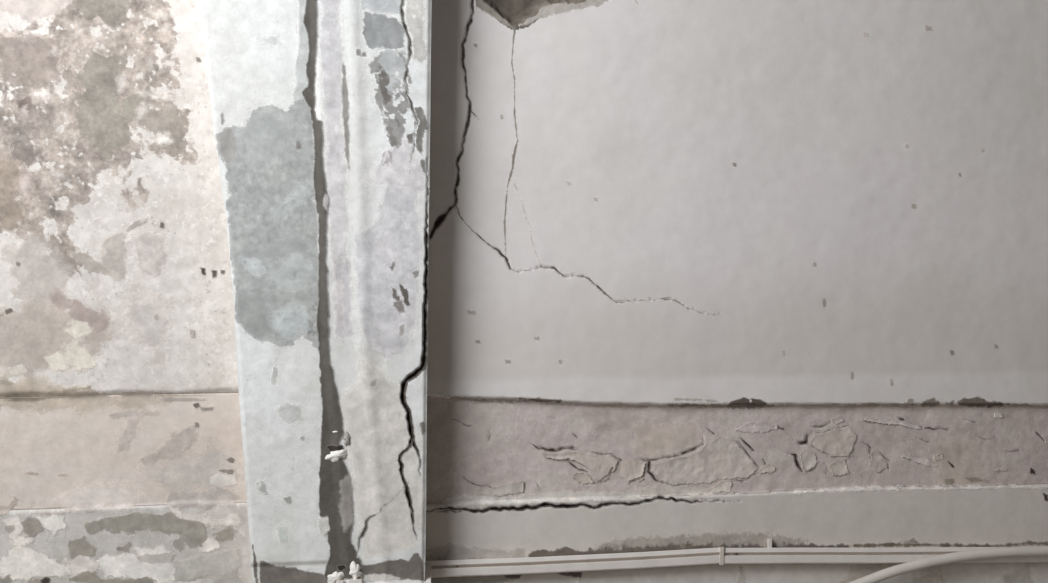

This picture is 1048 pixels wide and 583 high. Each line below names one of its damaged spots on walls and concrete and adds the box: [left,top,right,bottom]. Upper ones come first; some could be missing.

spalling [476,0,608,30]
leakage [0,0,205,450]
peeling [200,0,427,583]
crack [358,0,766,551]
peeling [440,422,777,507]
crack [778,421,889,474]
peeling [792,416,1048,501]
crack [898,418,1044,452]
peeling [0,508,243,583]